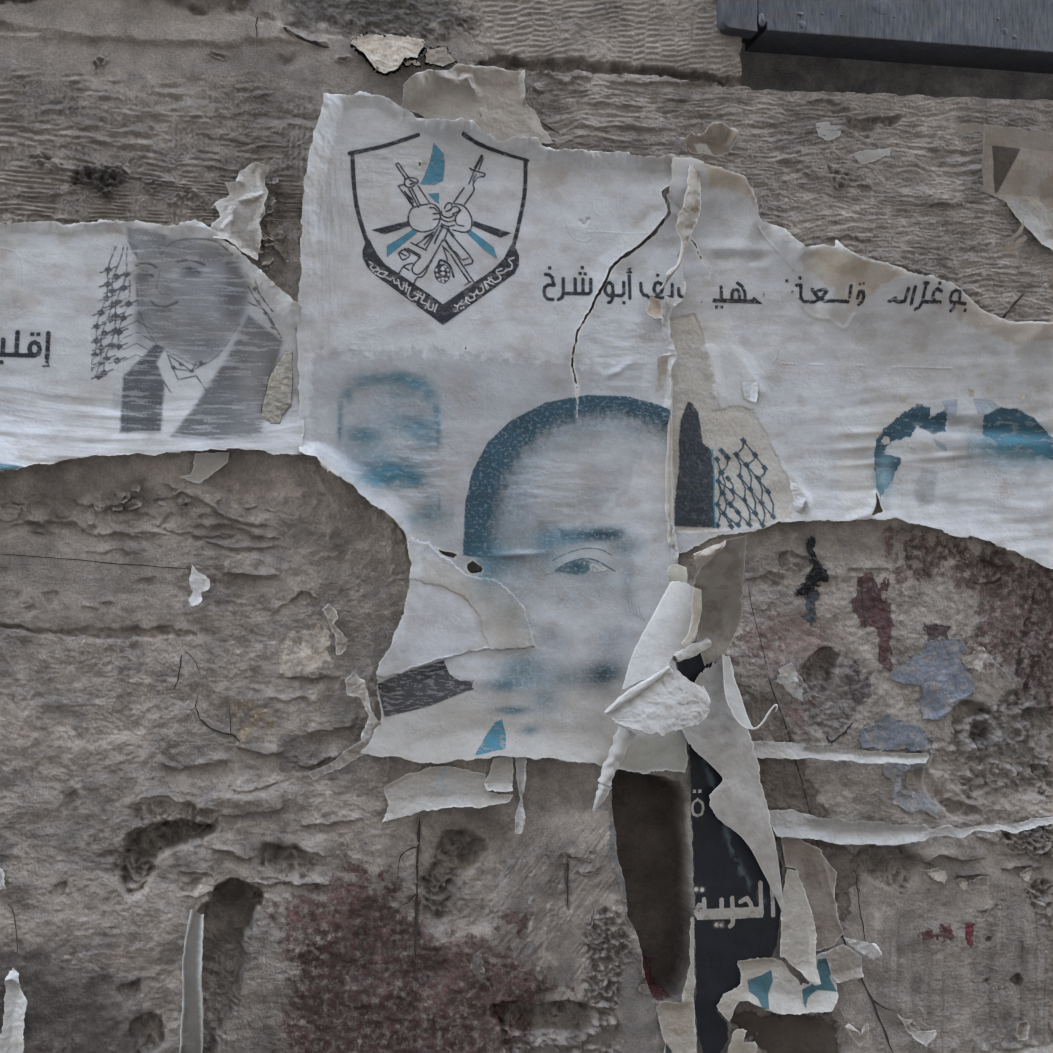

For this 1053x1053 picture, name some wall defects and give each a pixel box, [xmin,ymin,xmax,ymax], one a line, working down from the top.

spalling [70,162,210,211]
flaking render [258,178,289,270]
spalling [774,647,840,701]
spalling [858,638,1053,818]
spalling [111,818,217,902]
spalling [197,878,264,1053]
spalling [415,828,488,930]
water stain [494,908,528,958]
peeling [472,769,695,1053]
spalling [851,844,990,896]
spalling [1020,866,1053,917]
spalling [117,979,167,1053]